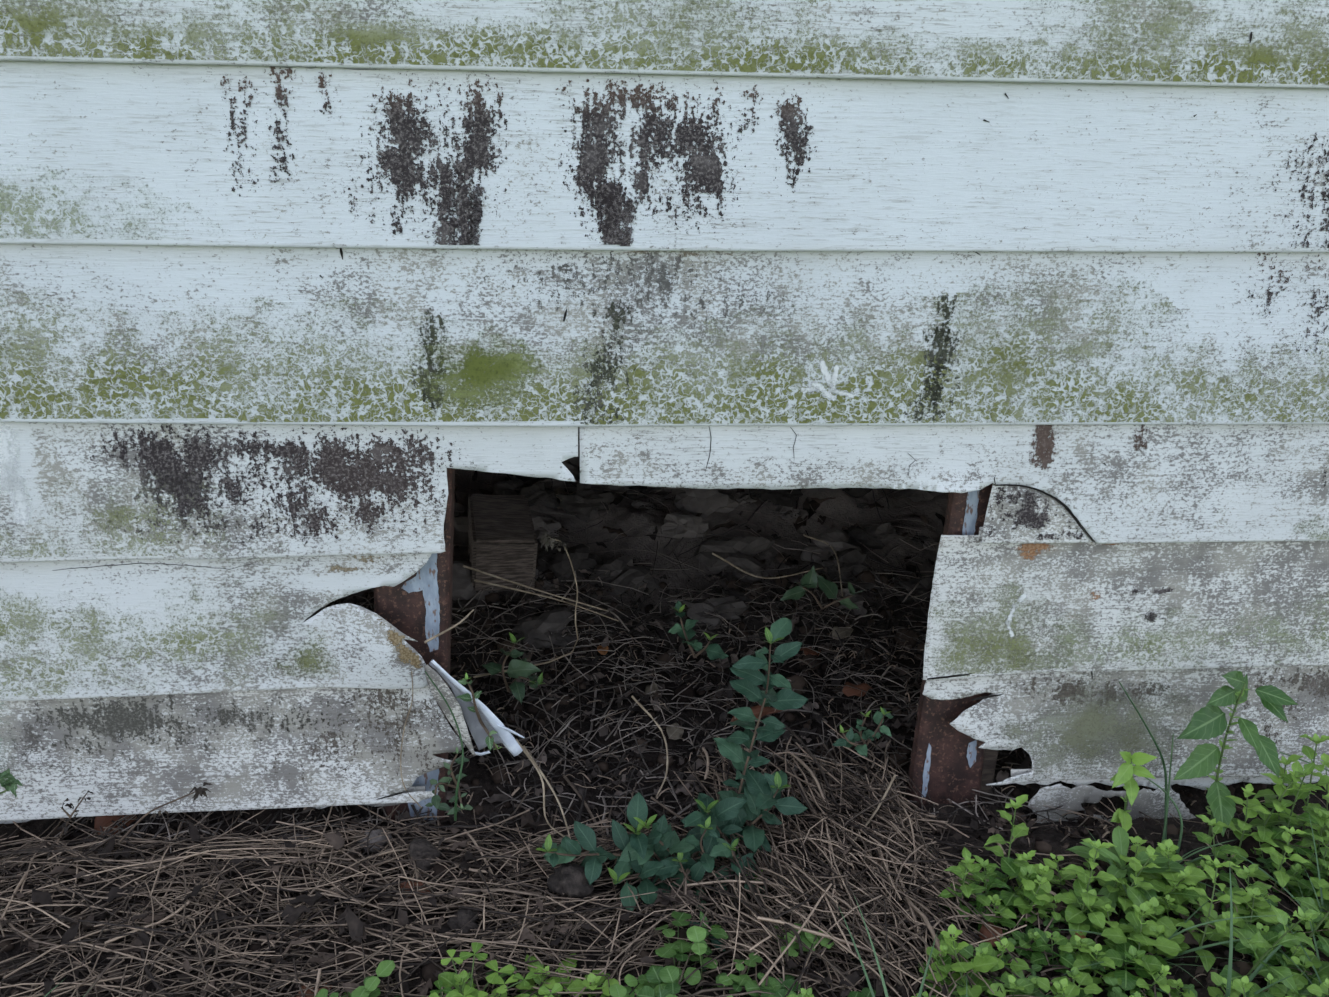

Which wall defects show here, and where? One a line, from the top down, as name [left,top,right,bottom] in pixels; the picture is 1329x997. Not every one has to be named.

water stain [220,66,297,197]
water stain [341,73,511,245]
water stain [555,74,818,254]
water stain [1245,133,1329,354]
water stain [904,294,966,421]
water stain [86,308,474,558]
peeling [962,490,979,535]
crack [994,475,1095,542]
peeling [402,553,525,756]
peeling [408,769,439,821]
peeling [922,744,932,797]
peeling [966,740,977,768]